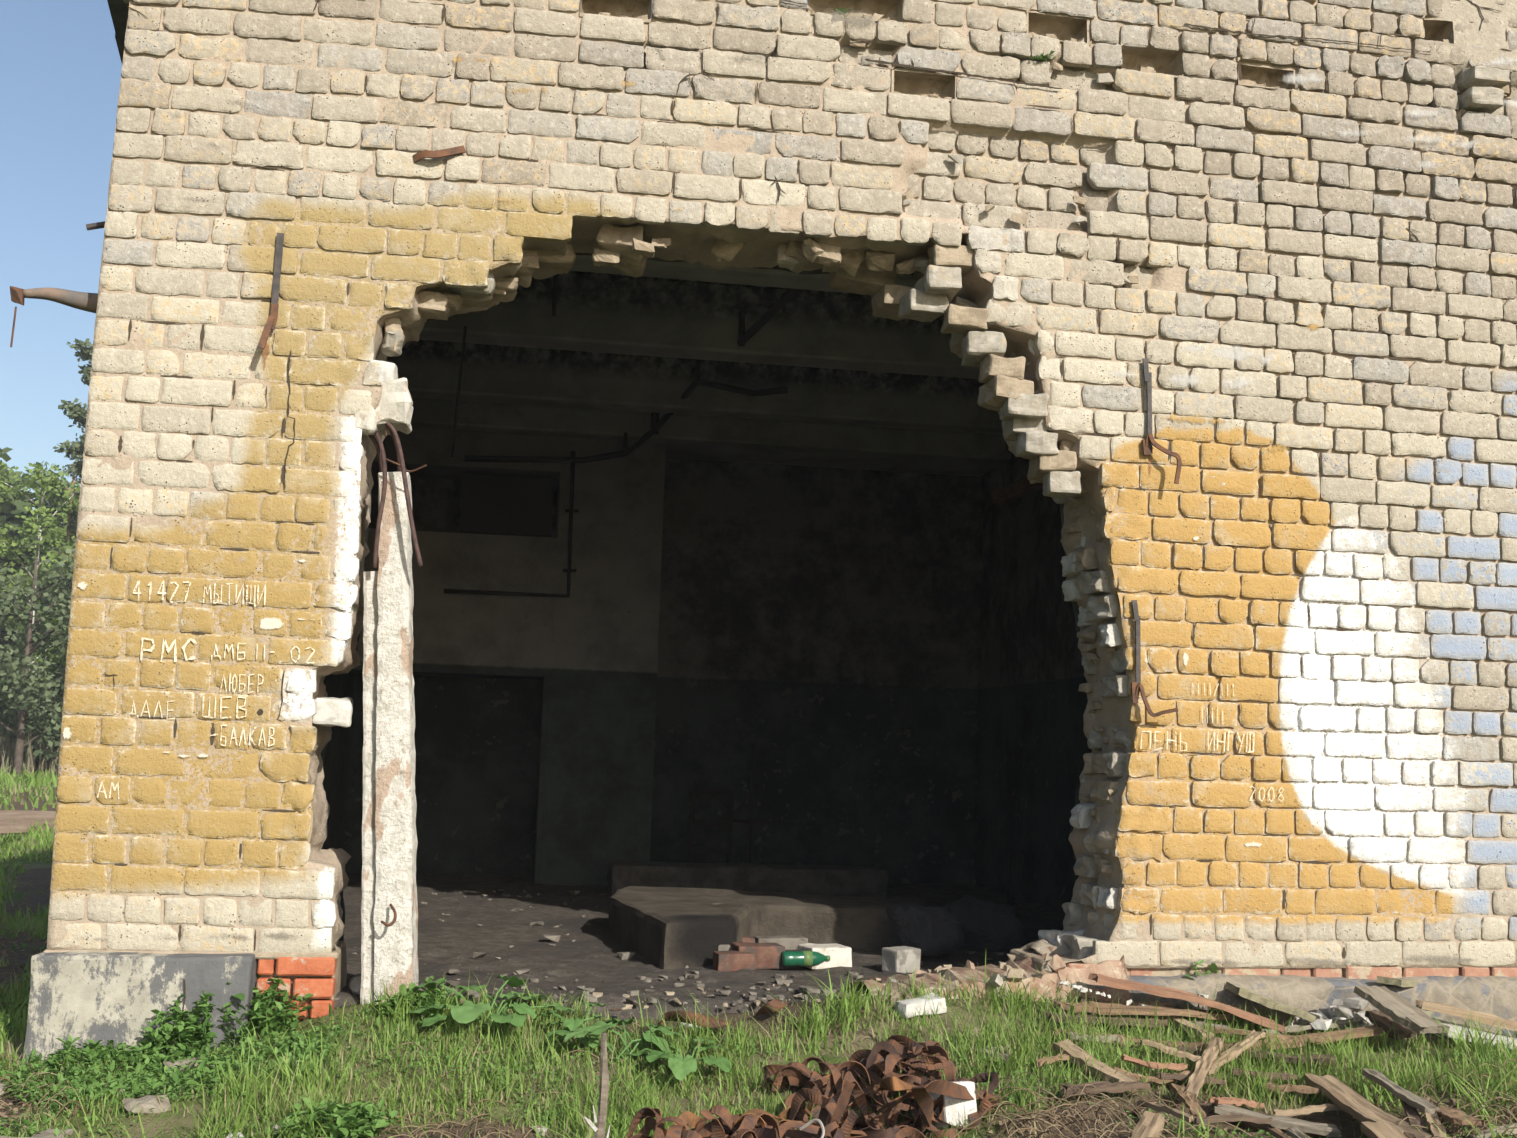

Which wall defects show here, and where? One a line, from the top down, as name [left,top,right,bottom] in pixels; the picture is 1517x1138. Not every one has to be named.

spalling [579,0,652,23]
spalling [808,0,903,22]
spalling [1026,9,1092,45]
spalling [1423,15,1454,44]
spalling [839,39,957,103]
spalling [1019,42,1183,91]
spalling [1237,57,1303,91]
spalling [902,130,1108,231]
spalling [417,223,671,320]
spalling [381,317,405,357]
spalling [368,422,423,568]
spalling [776,237,1131,960]